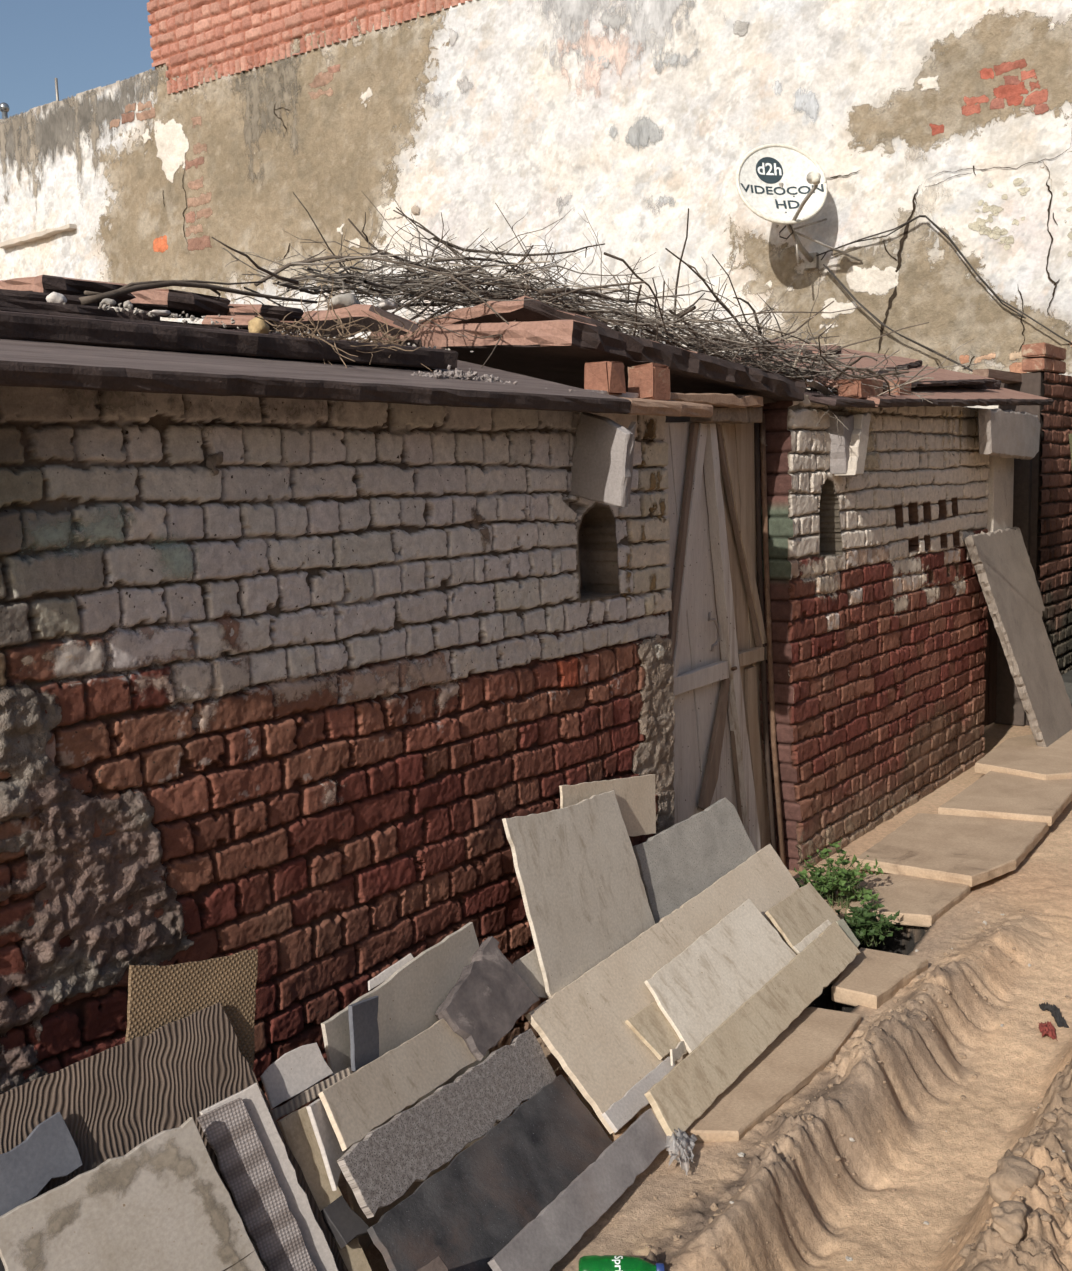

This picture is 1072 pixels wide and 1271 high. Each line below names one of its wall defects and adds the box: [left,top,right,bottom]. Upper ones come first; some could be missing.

flaking render [89,4,450,304]
flaking render [720,208,1072,375]
flaking render [847,8,1072,157]
crack [878,128,1072,353]
peeling [968,178,1030,251]
peeling [1041,167,1072,257]
peeling [268,656,459,709]
flaking render [0,611,251,1095]
peeling [320,779,336,804]